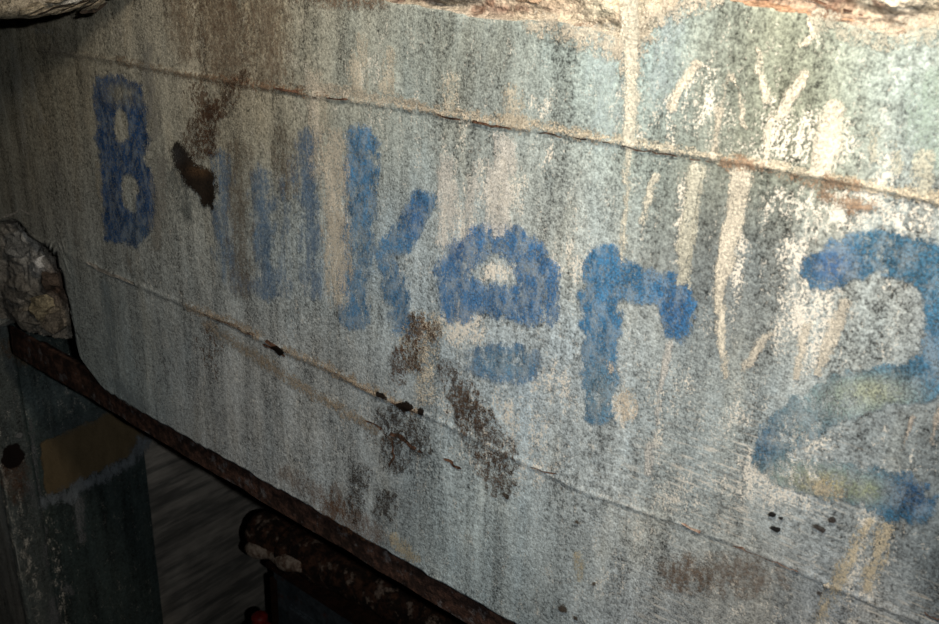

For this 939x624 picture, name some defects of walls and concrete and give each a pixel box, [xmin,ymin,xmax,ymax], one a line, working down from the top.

spalling [385,0,679,42]
spalling [730,0,939,36]
hole [169,140,219,209]
crack [36,45,939,207]
efflorescence [676,71,748,290]
efflorescence [712,47,809,377]
efflorescence [809,99,844,178]
damp [867,125,936,195]
spalling [0,220,74,339]
crack [198,312,289,357]
crack [364,420,422,468]
crack [444,458,461,469]